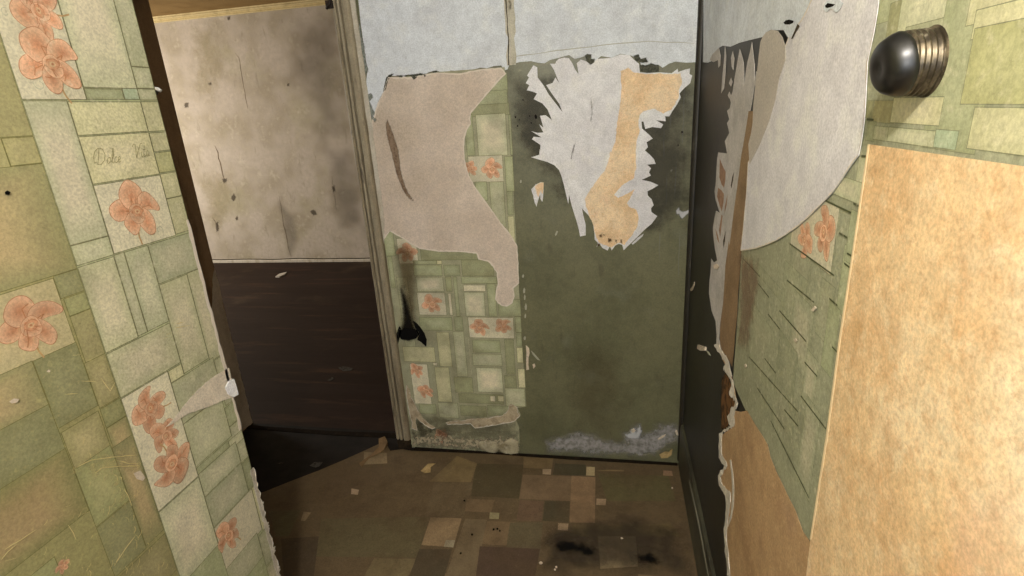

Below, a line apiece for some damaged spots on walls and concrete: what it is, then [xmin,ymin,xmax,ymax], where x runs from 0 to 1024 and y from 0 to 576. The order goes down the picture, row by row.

peeling [634,54,659,73]
peeling [741,0,879,251]
peeling [368,68,527,318]
peeling [520,180,544,207]
peeling [166,268,252,431]
peeling [721,373,735,429]
water stain [549,425,678,456]